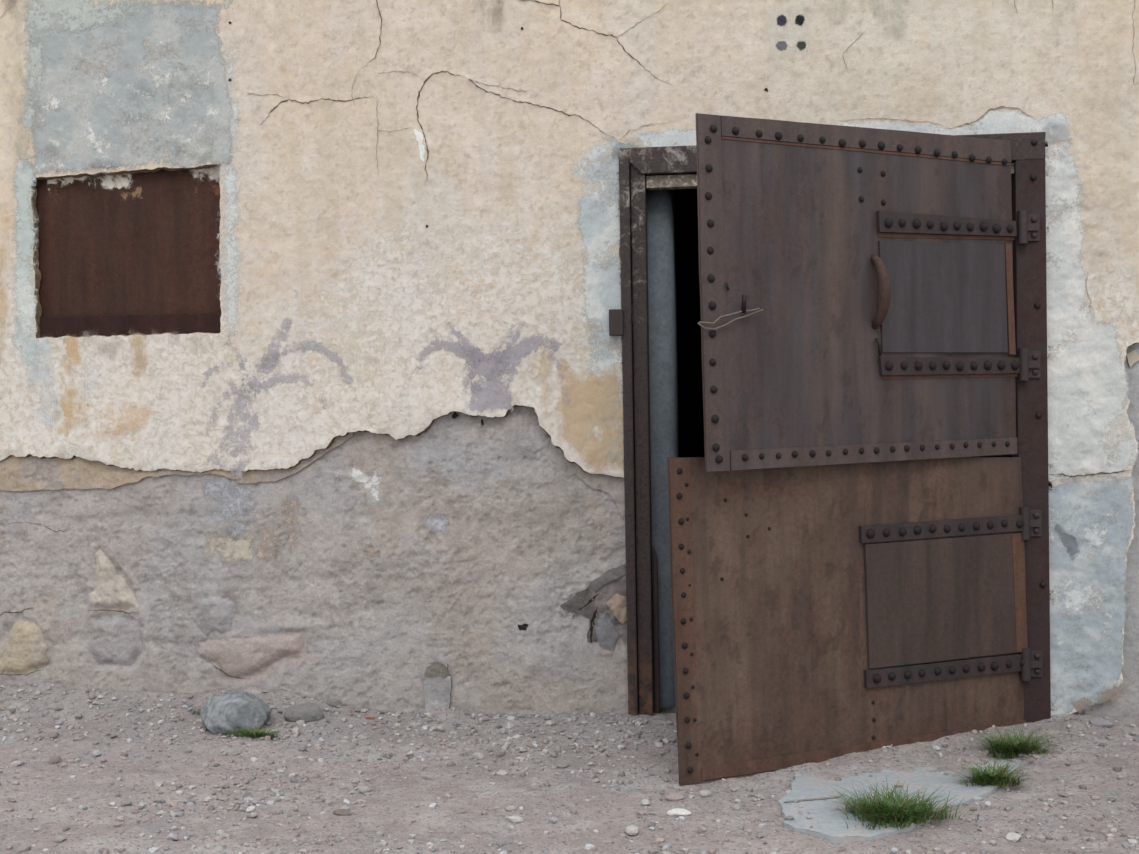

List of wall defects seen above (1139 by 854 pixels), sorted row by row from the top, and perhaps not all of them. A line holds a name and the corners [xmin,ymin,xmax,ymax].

peeling [35,54,222,190]
crack [248,0,612,173]
crack [522,0,674,87]
rust [121,186,142,199]
rust [878,233,1016,355]
spalling [0,122,696,715]
peeling [836,106,1139,717]
rust [1012,533,1028,652]